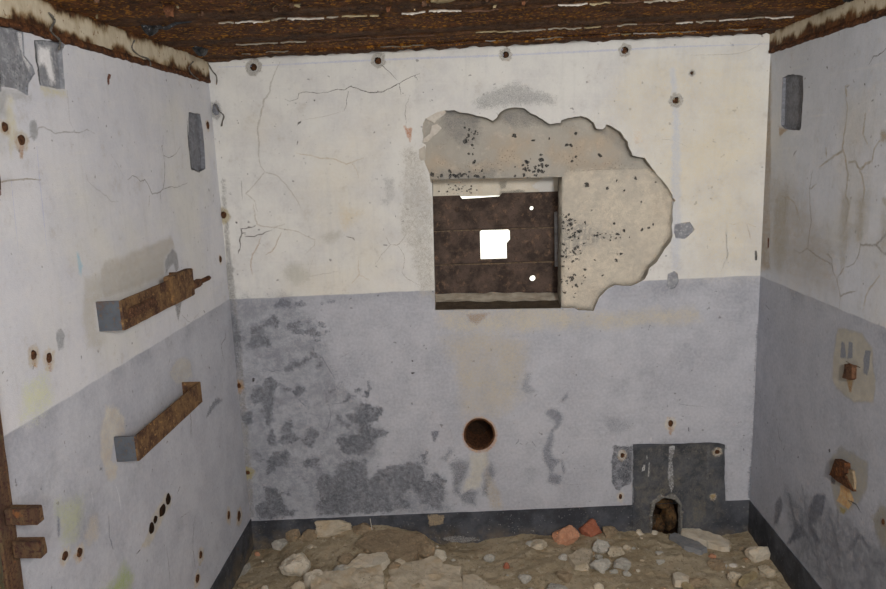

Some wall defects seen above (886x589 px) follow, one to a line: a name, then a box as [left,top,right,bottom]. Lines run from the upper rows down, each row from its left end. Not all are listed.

spalling [0,17,211,96]
peeling [218,4,379,24]
peeling [236,16,794,76]
peeling [542,0,684,8]
peeling [768,9,886,54]
crack [238,64,420,272]
flaking render [419,107,695,311]
crack [794,85,886,310]
water stain [221,179,498,521]